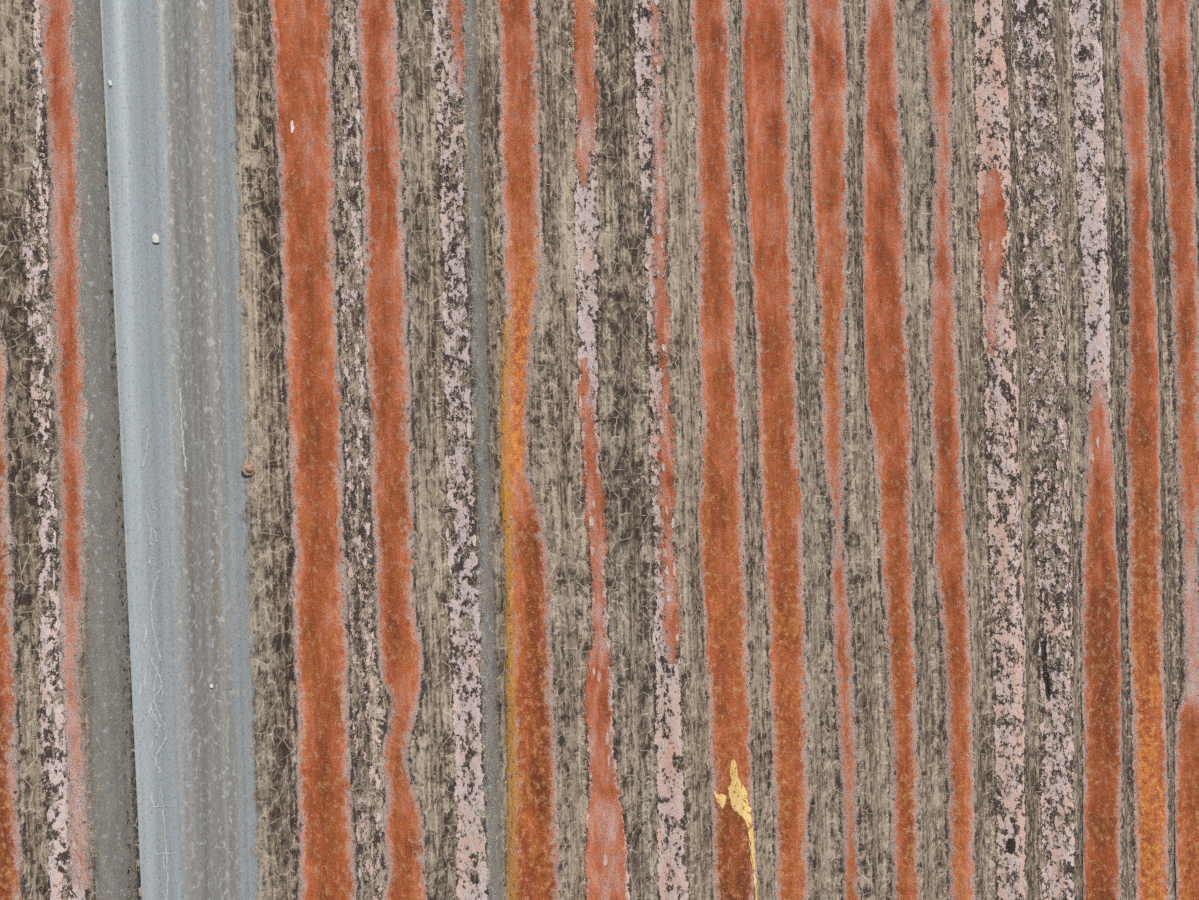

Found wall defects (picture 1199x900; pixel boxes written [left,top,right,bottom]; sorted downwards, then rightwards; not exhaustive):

corrosion [0,315,27,900]
corrosion [40,0,93,890]
corrosion [266,0,359,900]
corrosion [354,0,432,900]
corrosion [496,0,563,900]
corrosion [570,0,600,187]
corrosion [578,357,627,900]
corrosion [648,0,681,664]
corrosion [687,0,923,900]
corrosion [922,0,978,900]
peeling [971,0,1112,900]
corrosion [1079,0,1199,900]